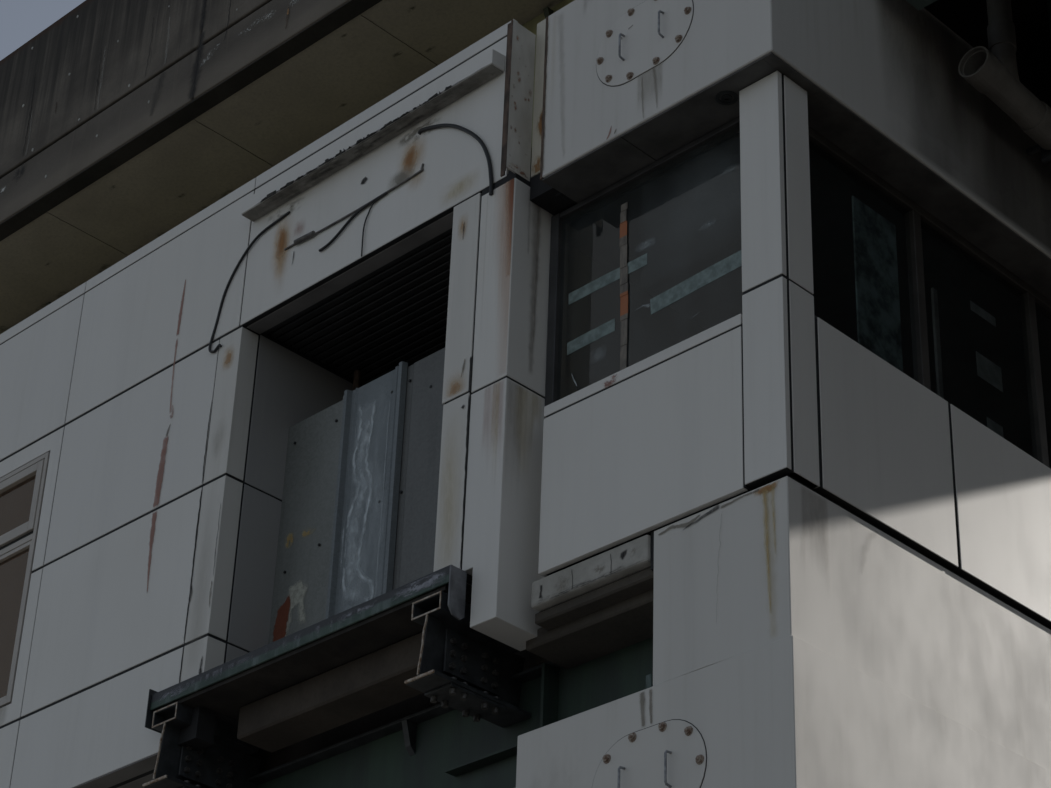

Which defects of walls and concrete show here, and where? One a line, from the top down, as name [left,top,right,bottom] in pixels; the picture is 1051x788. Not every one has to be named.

peeling [260,85,452,203]
rust [394,146,417,184]
rust [276,228,287,260]
rust [147,280,186,592]
leakage [341,405,375,601]